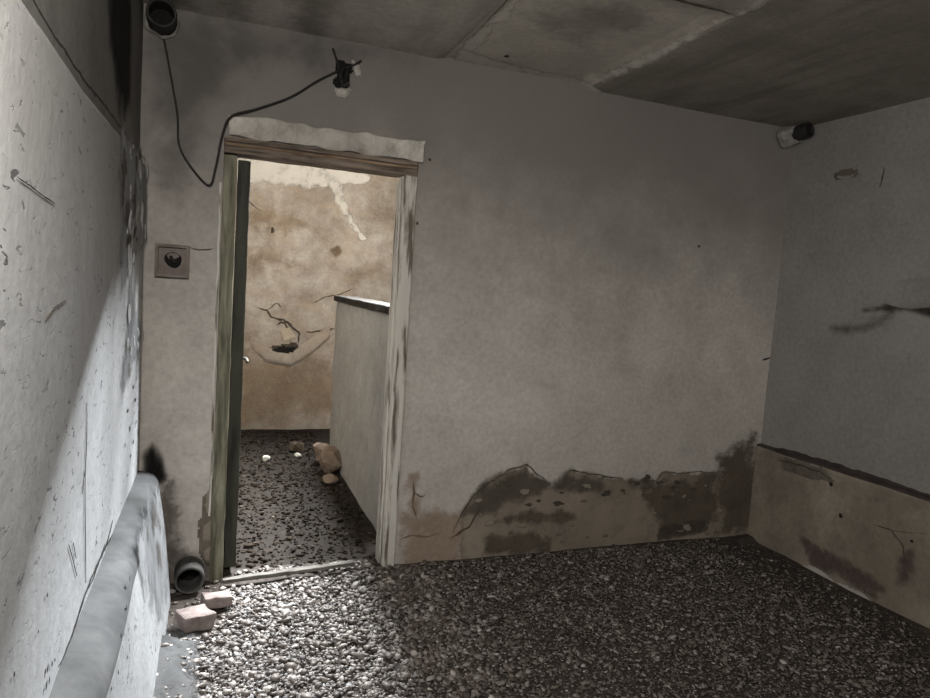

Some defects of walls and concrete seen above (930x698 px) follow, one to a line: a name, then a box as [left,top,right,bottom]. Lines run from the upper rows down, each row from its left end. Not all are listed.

crack [676,0,729,14]
crack [260,303,334,333]
water stain [485,510,573,555]
water stain [467,473,601,513]
spalling [453,464,748,559]
water stain [628,432,757,540]